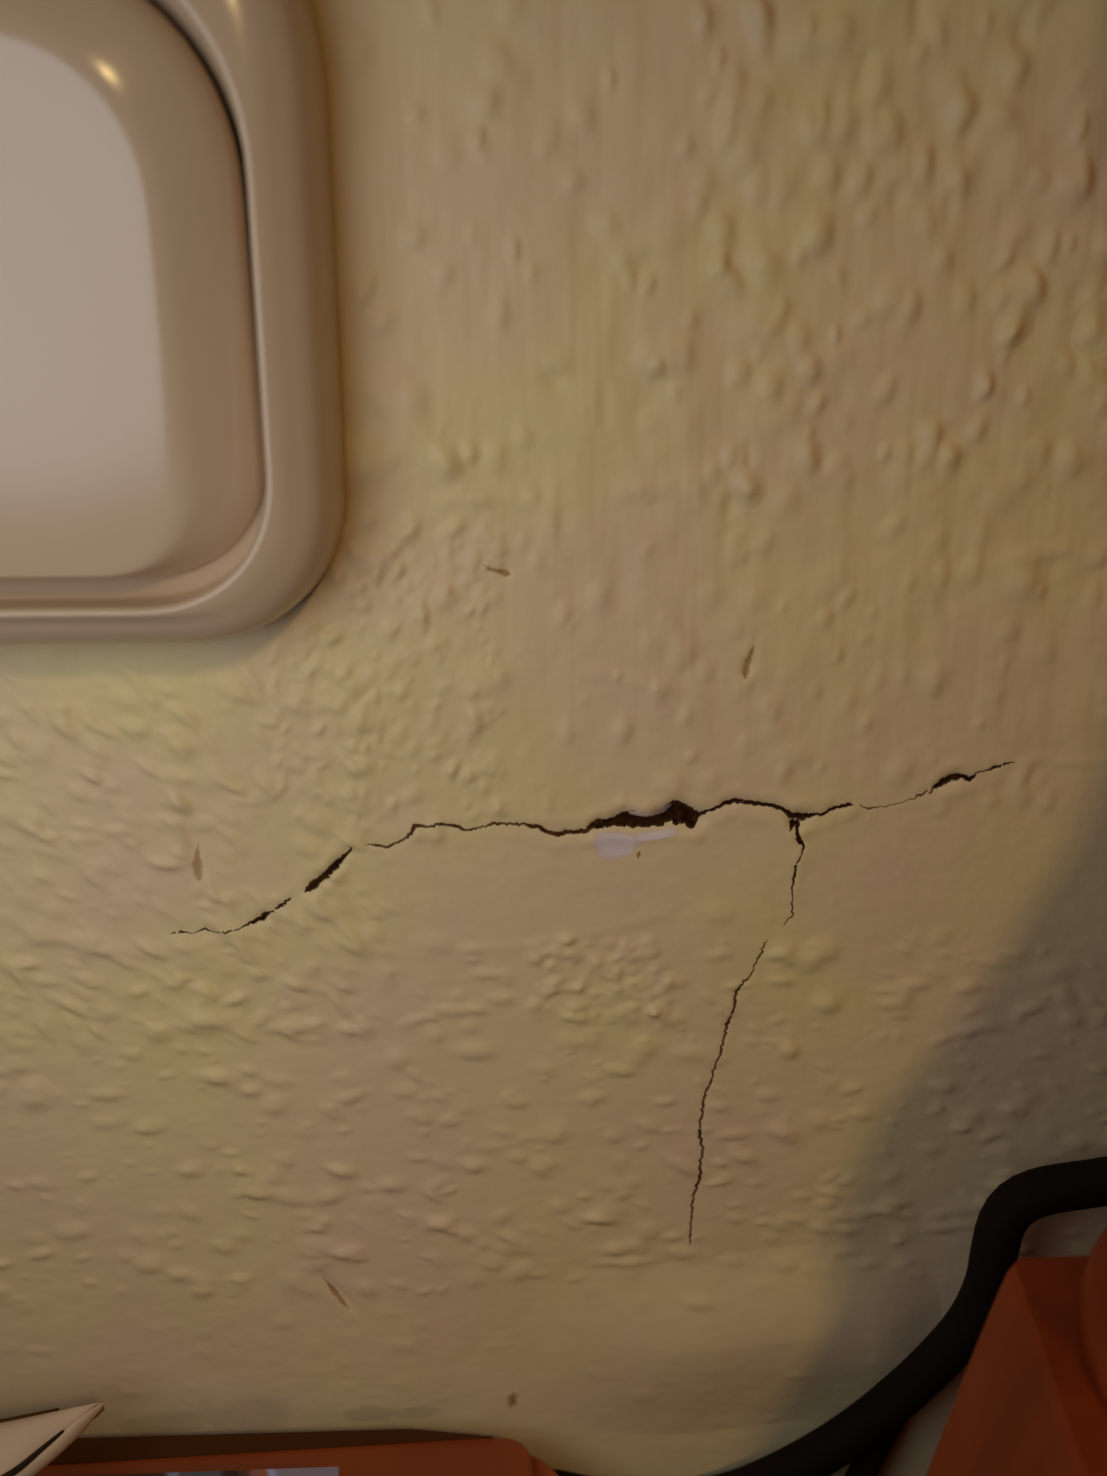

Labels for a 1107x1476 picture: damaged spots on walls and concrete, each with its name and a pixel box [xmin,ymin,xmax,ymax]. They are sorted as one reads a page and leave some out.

crack [171,762,1014,1246]